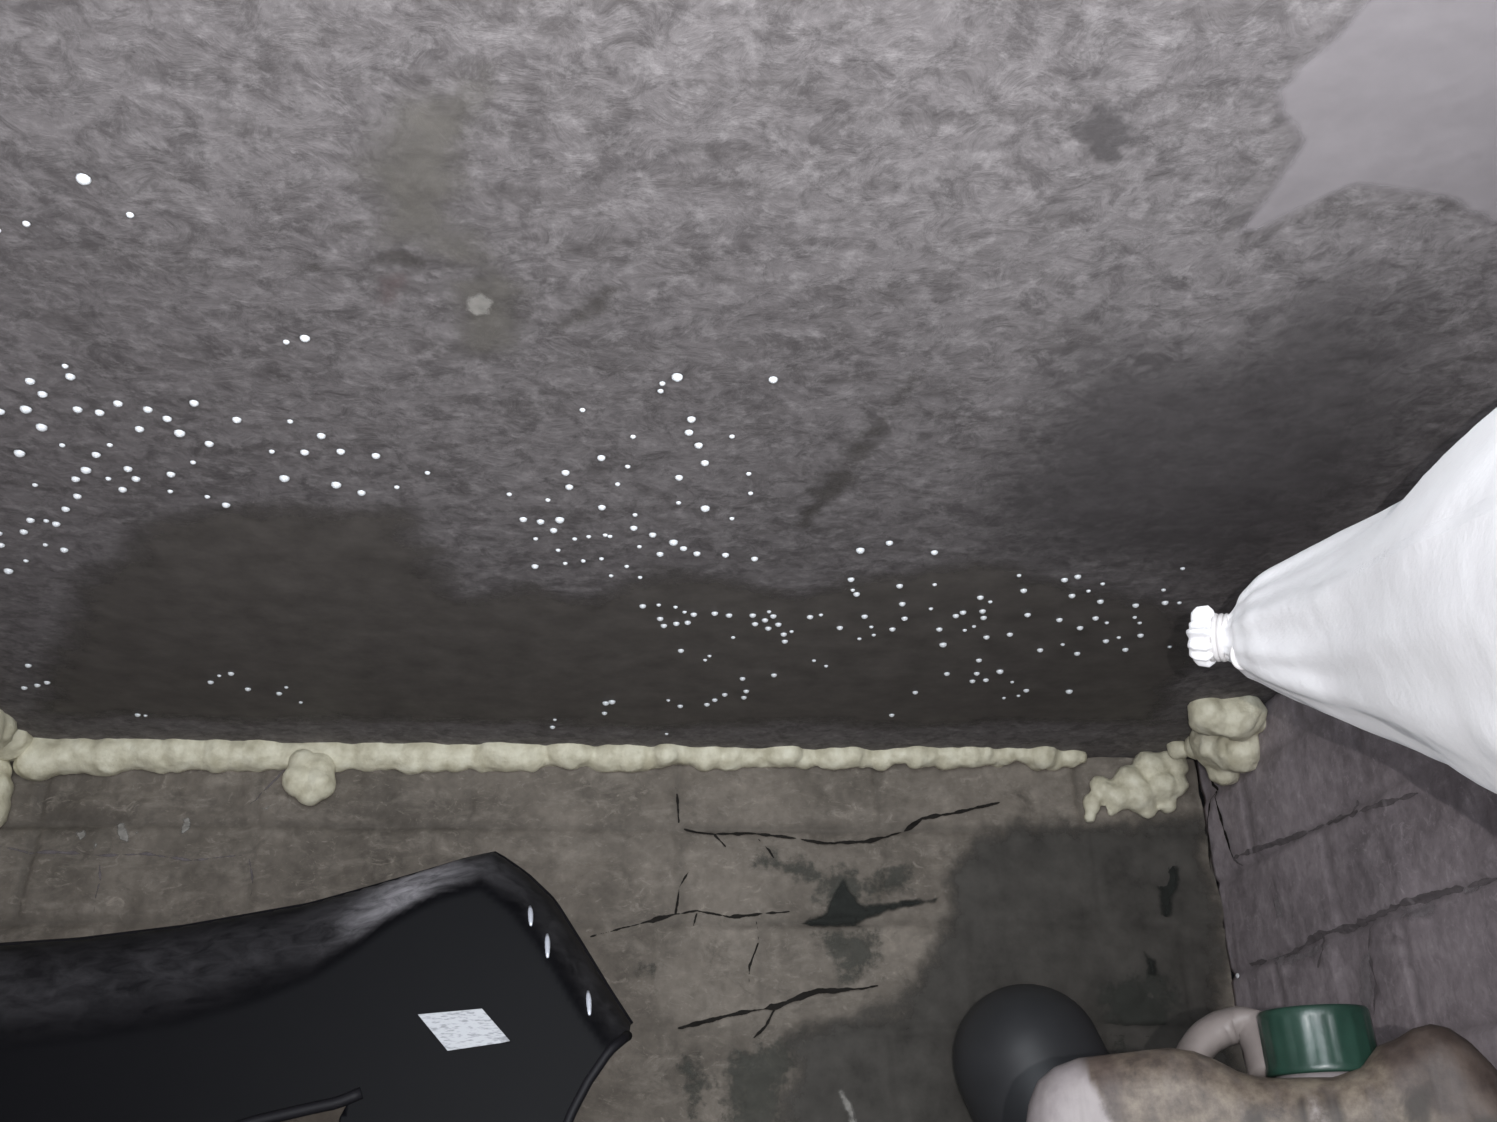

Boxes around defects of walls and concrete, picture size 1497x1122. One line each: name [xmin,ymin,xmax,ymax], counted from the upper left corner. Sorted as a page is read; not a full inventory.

water stain [44,508,1193,728]
crack [675,787,1000,858]
crack [1207,781,1418,868]
water stain [763,857,906,897]
crack [590,873,878,1038]
water stain [826,934,877,980]
crack [1250,878,1497,1011]
water stain [729,1041,794,1122]
water stain [839,1091,855,1122]